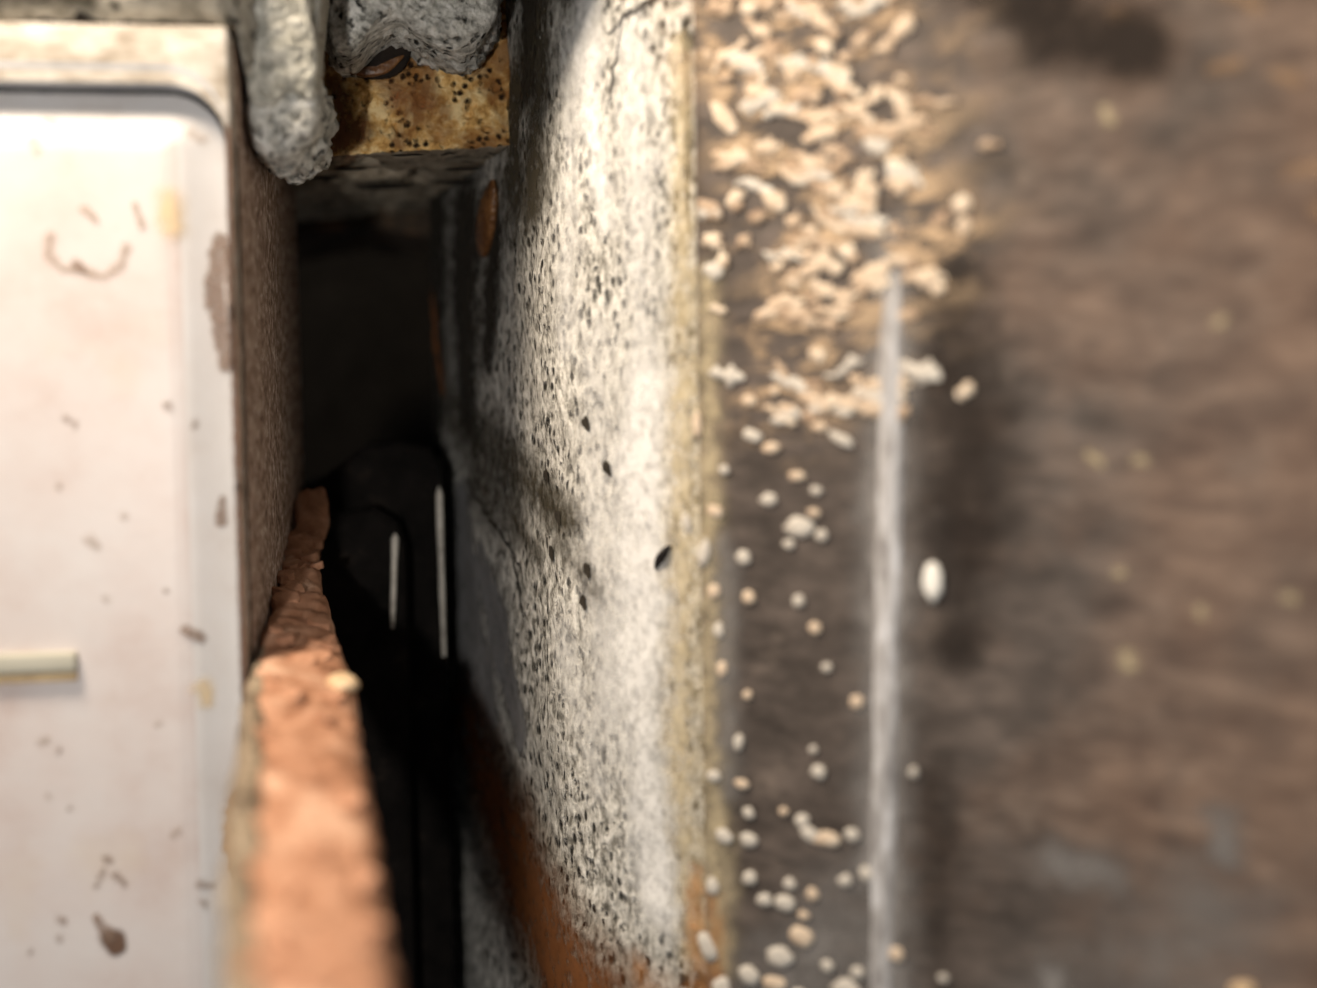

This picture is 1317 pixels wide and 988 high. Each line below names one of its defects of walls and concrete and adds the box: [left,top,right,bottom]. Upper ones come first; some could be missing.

corrosion [330,79,371,159]
corrosion [200,125,399,988]
crack [464,477,524,623]
leakage [429,0,759,962]
leakage [742,417,787,453]
leakage [759,493,778,507]
leakage [782,471,829,549]
leakage [807,405,854,448]
leakage [927,266,994,601]
corrosion [451,672,621,988]
leakage [779,807,860,847]
leakage [711,870,864,988]